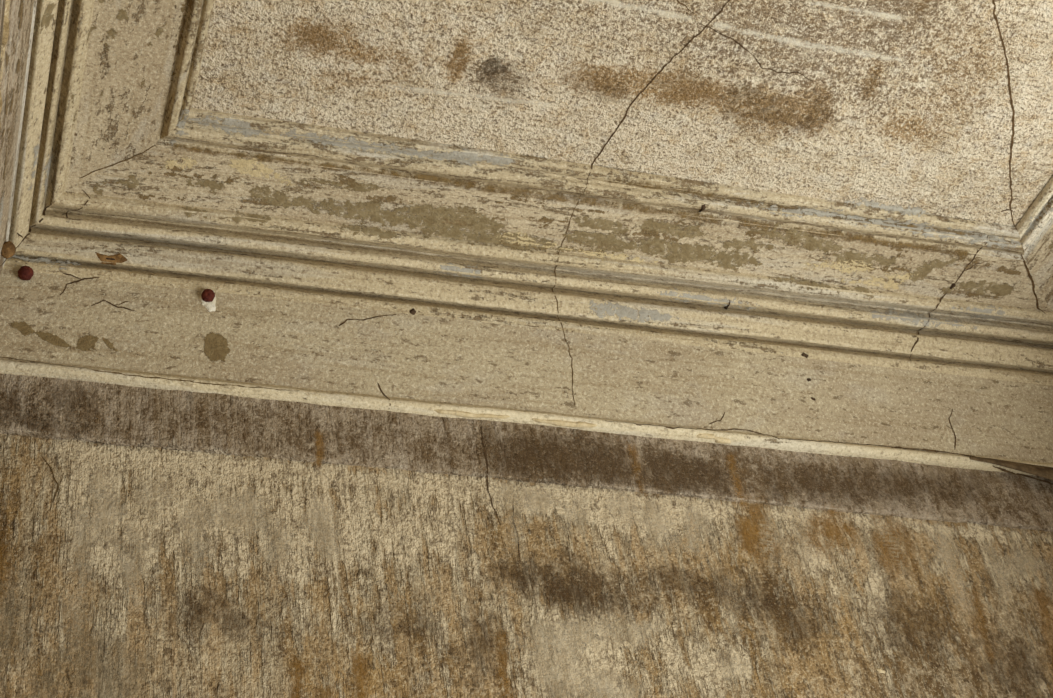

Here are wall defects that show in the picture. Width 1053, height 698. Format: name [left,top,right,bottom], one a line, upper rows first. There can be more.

peeling [0,0,58,226]
peeling [87,0,129,50]
peeling [147,0,193,81]
peeling [170,108,516,167]
peeling [93,154,1053,331]
crack [552,0,812,401]
crack [910,236,988,360]
crack [992,0,1046,314]